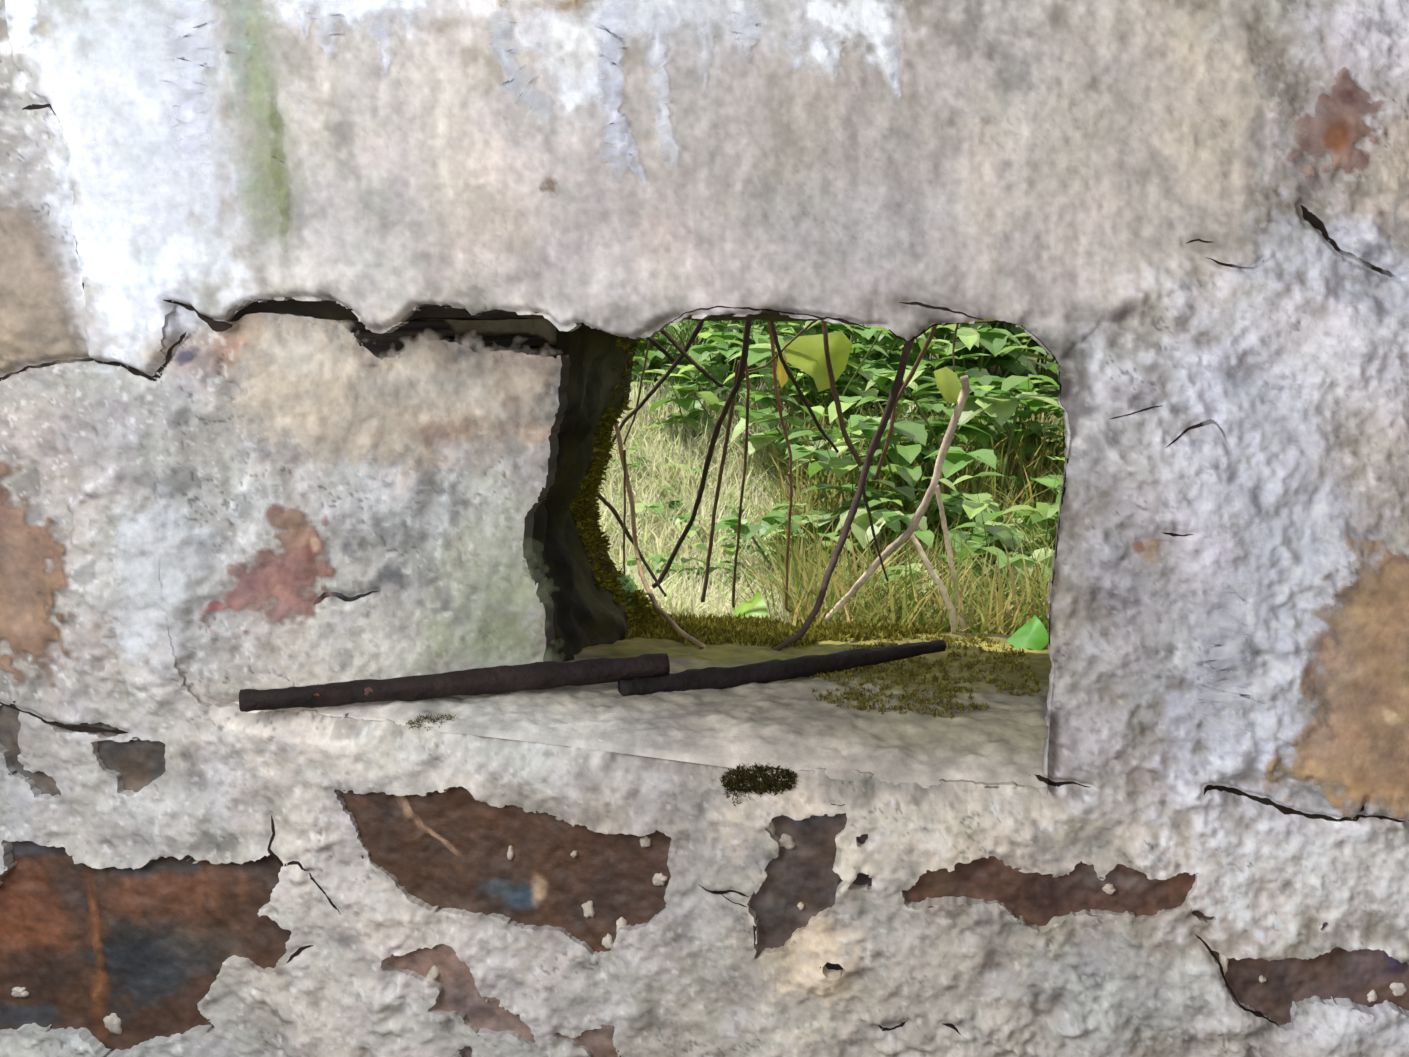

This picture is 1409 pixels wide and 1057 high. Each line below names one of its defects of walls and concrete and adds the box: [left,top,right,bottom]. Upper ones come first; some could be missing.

water stain [280,0,427,66]
water stain [787,0,900,95]
crack [22,104,63,129]
water stain [493,0,758,181]
crack [1300,205,1397,279]
crack [0,300,232,381]
crack [1204,785,1409,822]
spalling [339,786,671,953]
spalling [749,804,872,959]
spalling [903,856,1214,926]
spalling [0,841,291,1051]
spalling [1213,947,1409,1025]